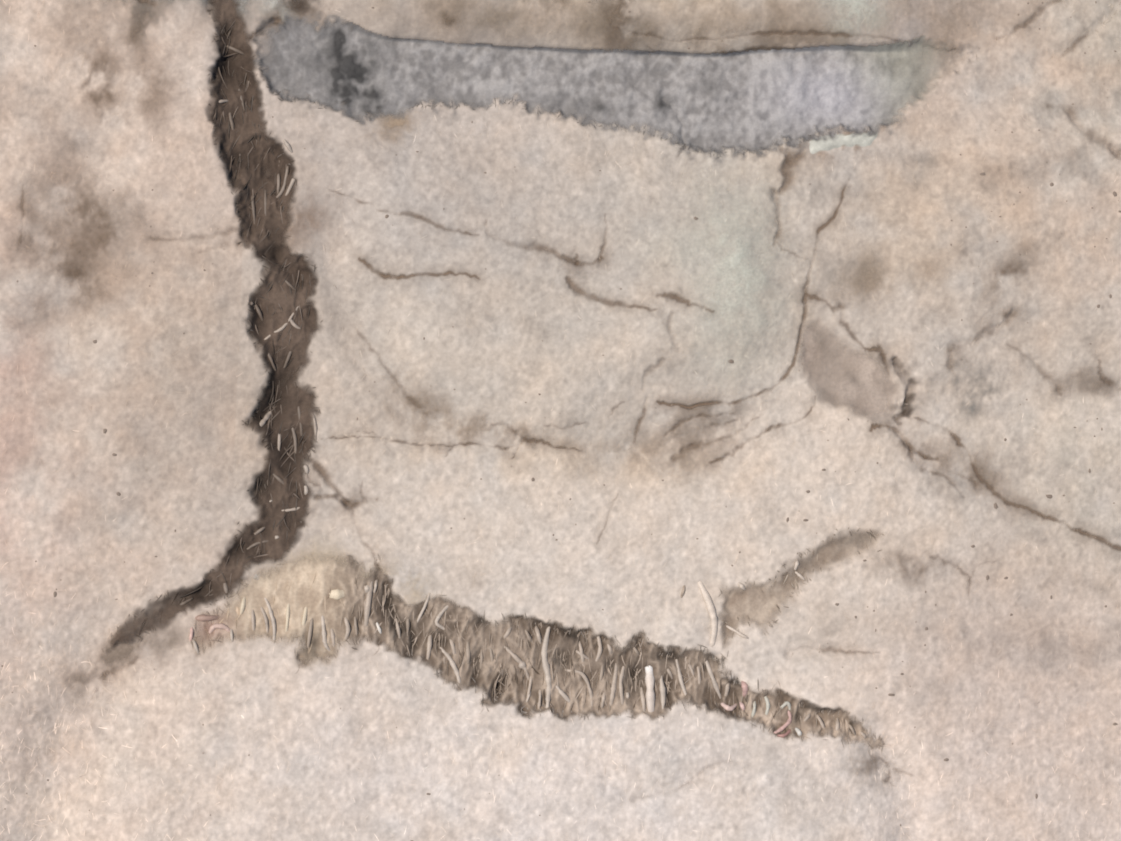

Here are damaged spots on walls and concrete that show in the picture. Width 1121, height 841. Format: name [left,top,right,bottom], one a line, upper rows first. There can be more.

crack [251,18,284,37]
peeling [255,16,931,160]
crack [782,158,790,189]
crack [817,188,845,234]
crack [358,258,479,279]
crack [538,247,709,310]
crack [635,292,885,463]
crack [503,439,577,458]
crack [870,397,932,459]
crack [314,462,358,507]
crack [952,434,1121,550]
peeling [681,527,885,647]